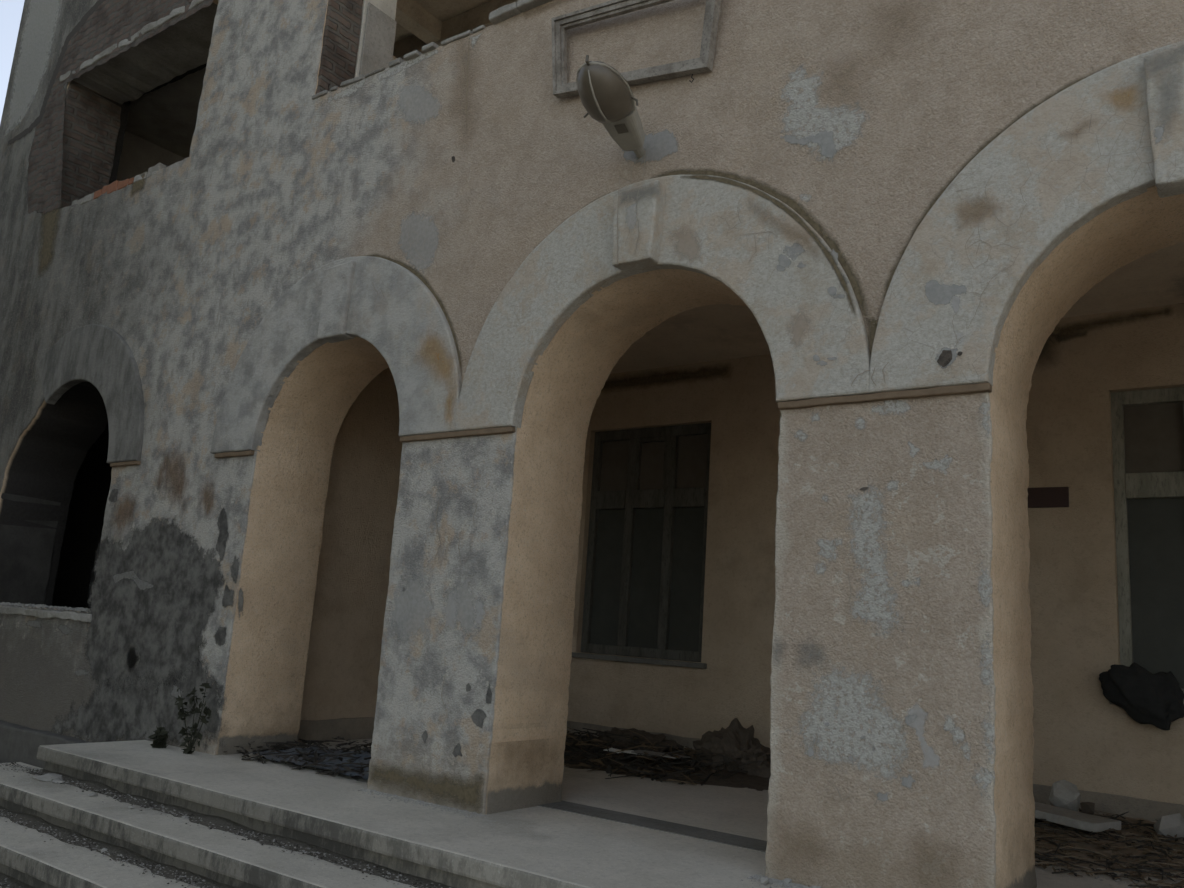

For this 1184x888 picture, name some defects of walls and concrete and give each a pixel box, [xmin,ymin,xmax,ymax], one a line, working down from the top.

peeling [781,66,866,160]
flaking render [52,508,244,749]
peeling [848,481,899,634]
peeling [800,667,939,788]